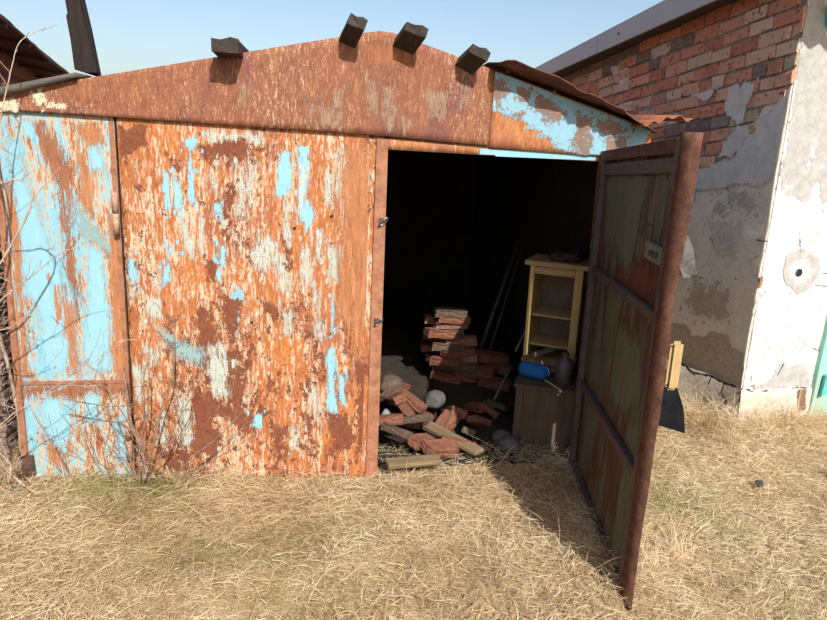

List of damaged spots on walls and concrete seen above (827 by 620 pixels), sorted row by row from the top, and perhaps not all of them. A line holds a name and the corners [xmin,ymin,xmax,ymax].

rust [198,133,263,172]
flaking render [480,0,827,220]
peeling [0,87,116,379]
rust [2,77,126,401]
rust [203,178,239,283]
rust [163,292,245,369]
rust [257,297,289,335]
rust [327,138,370,464]
peeling [31,386,73,460]
rust [37,430,77,475]
peeling [83,391,129,471]
rust [158,372,256,474]